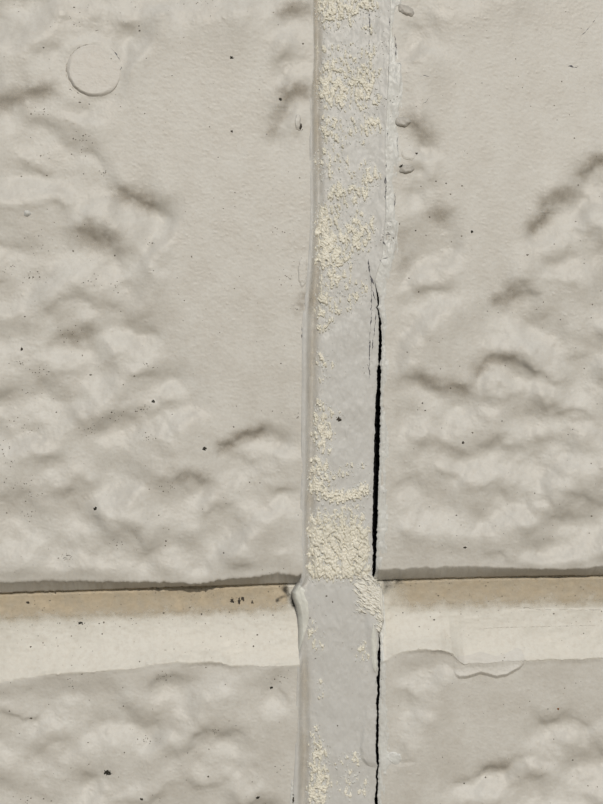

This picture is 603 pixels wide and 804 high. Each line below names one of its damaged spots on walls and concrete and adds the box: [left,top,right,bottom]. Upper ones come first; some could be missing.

crack [368,133,398,577]
crack [373,637,381,804]